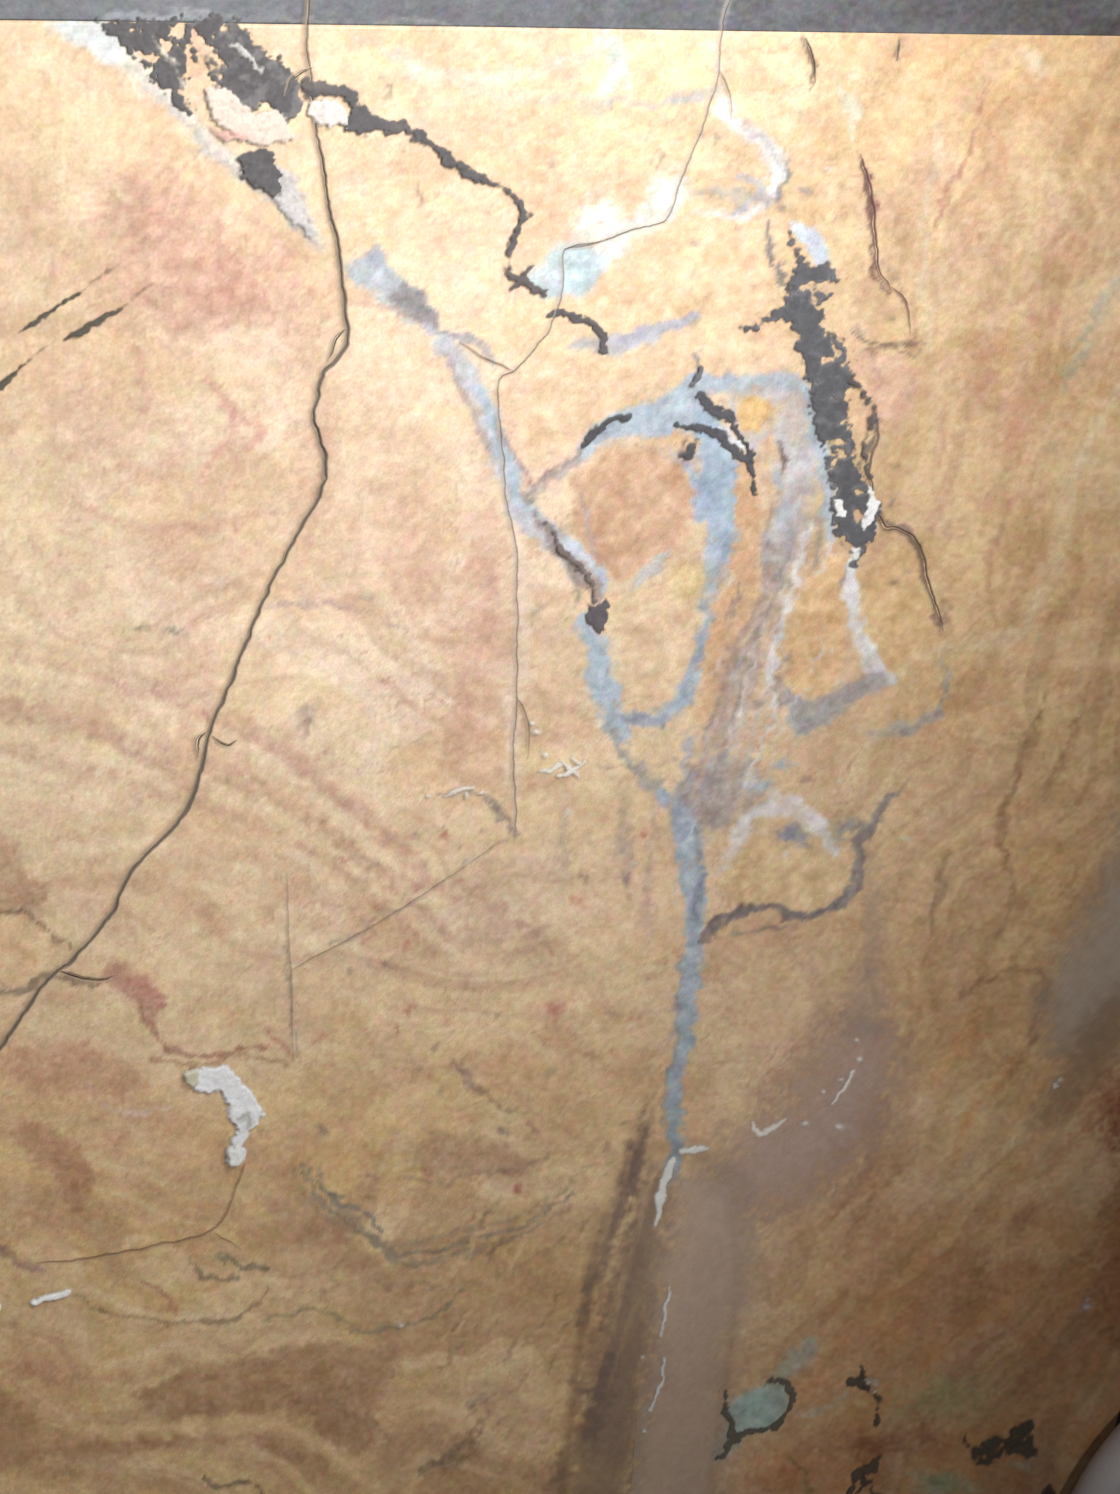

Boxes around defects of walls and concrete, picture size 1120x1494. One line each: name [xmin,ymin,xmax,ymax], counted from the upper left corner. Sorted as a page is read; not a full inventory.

peeling [95,12,608,354]
peeling [740,230,882,568]
crack [0,0,351,1051]
peeling [184,1065,266,1167]
peeling [715,1377,797,1460]
peeling [846,1456,881,1494]
peeling [846,1365,882,1427]
peeling [963,1420,1037,1466]